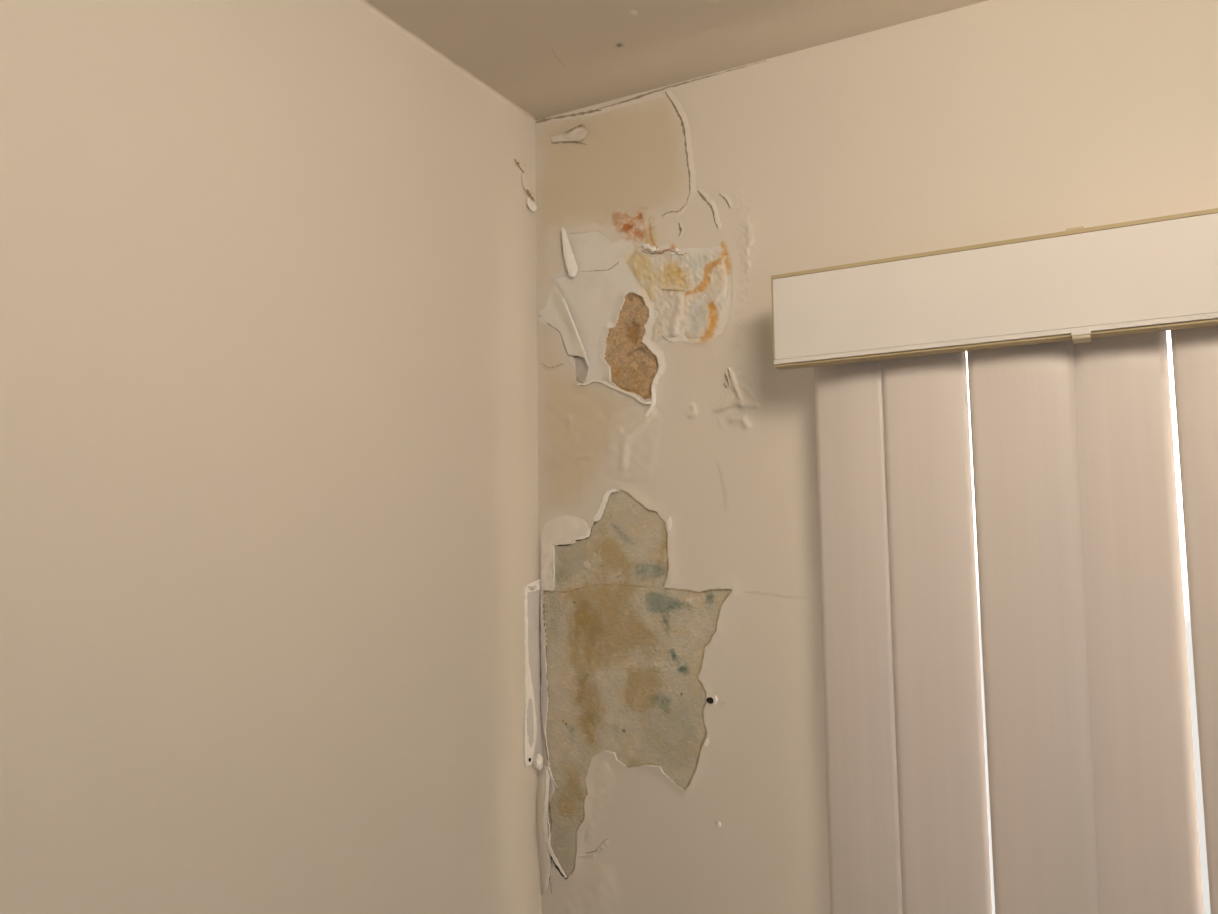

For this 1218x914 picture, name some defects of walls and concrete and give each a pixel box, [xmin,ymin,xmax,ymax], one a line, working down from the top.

peeling [514,157,537,212]
crack [536,61,767,237]
peeling [538,214,745,417]
peeling [536,473,752,896]